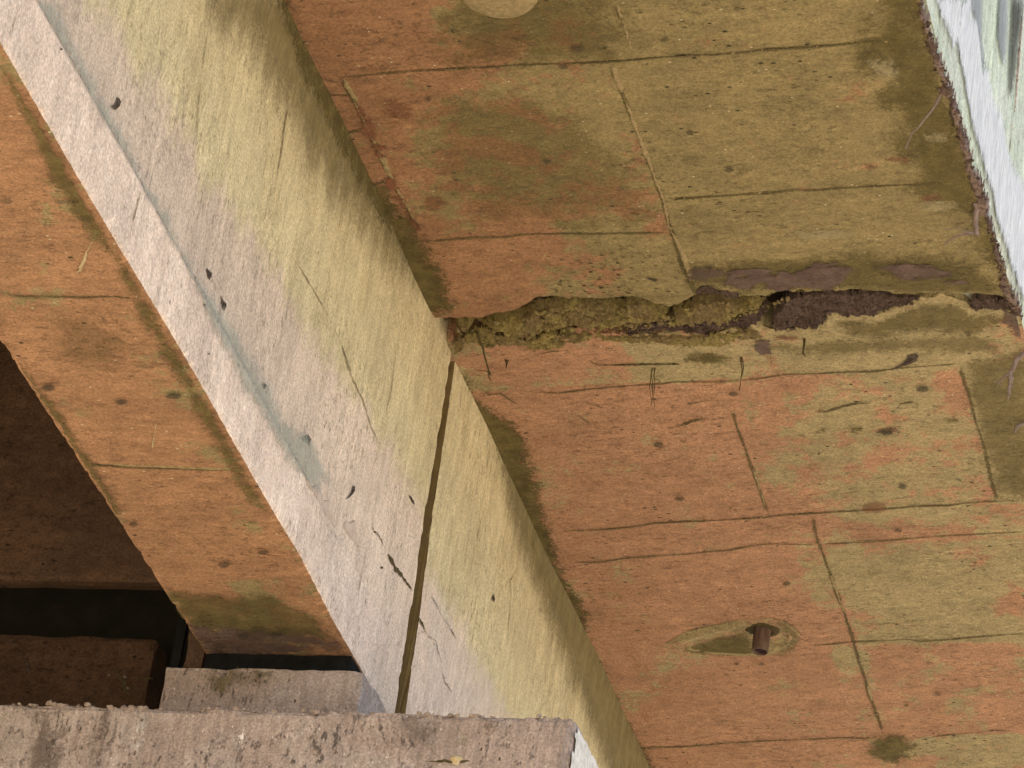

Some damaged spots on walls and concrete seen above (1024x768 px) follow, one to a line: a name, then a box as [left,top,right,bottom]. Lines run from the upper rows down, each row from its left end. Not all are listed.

spalling [453,0,1023,355]
water stain [937,0,1024,295]
crack [357,528,456,692]
crack [641,739,787,750]
crack [480,347,1024,740]
water stain [867,735,916,765]